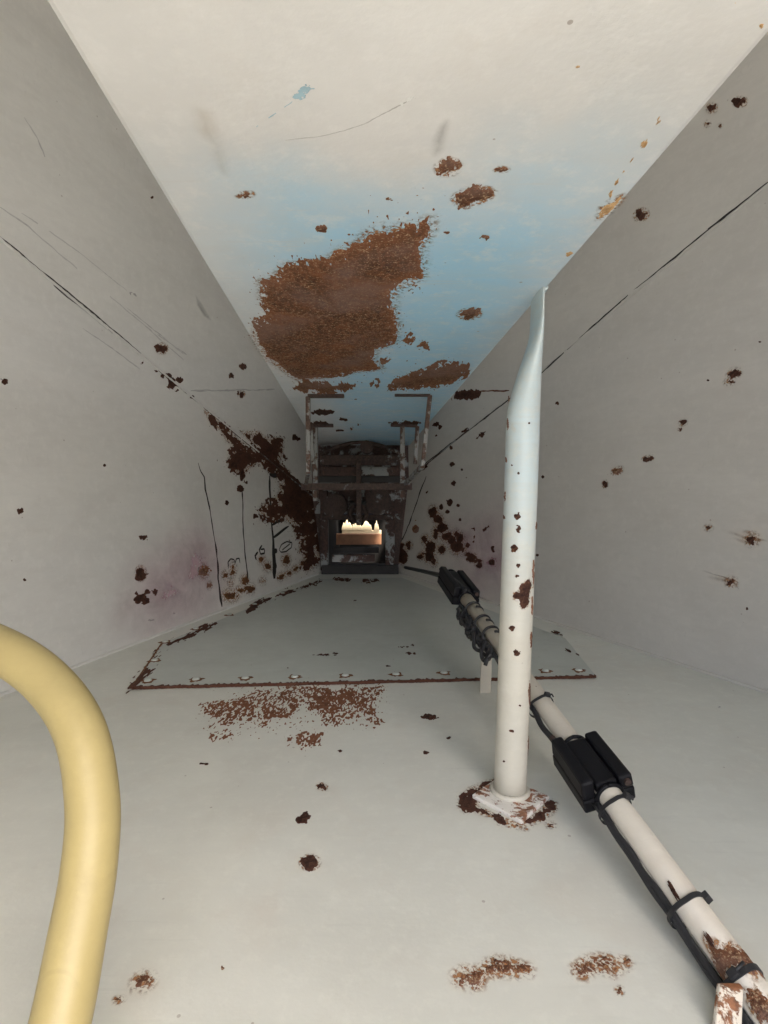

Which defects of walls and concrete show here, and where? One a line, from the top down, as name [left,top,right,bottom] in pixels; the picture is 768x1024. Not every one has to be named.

corrosion [731,97,747,108]
corrosion [435,156,462,177]
corrosion [451,184,495,210]
corrosion [248,208,482,400]
corrosion [126,409,498,751]
corrosion [503,512,539,615]
corrosion [519,668,596,707]
corrosion [456,779,557,830]
corrosion [299,854,319,872]
corrosion [452,955,535,991]
corrosion [571,953,632,995]